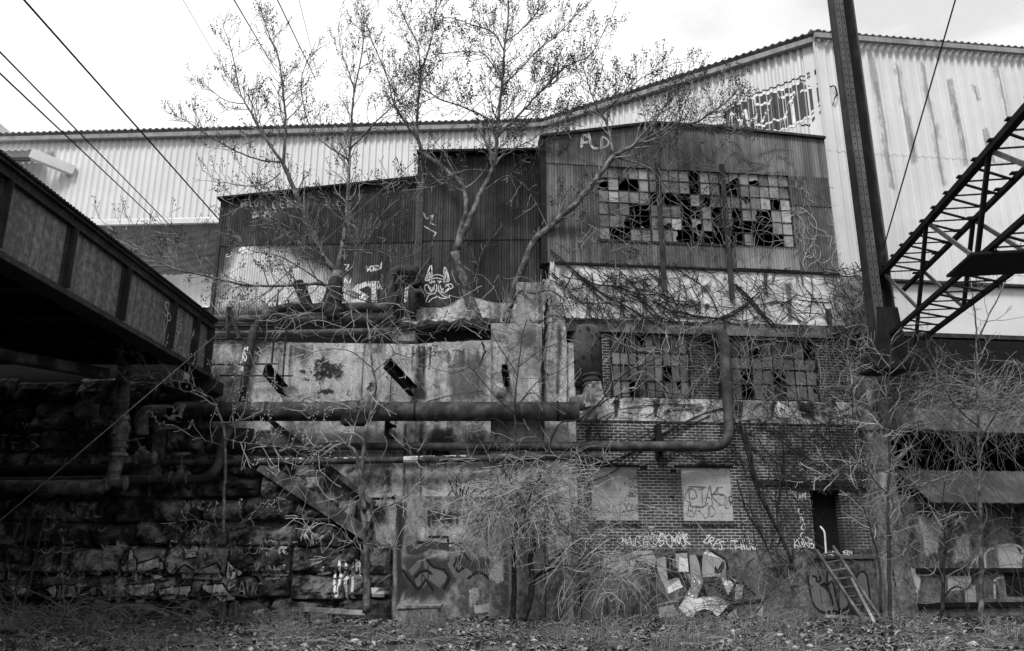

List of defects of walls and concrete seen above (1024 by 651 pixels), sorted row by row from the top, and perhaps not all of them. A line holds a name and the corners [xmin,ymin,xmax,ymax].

water stain [253,342,401,395]